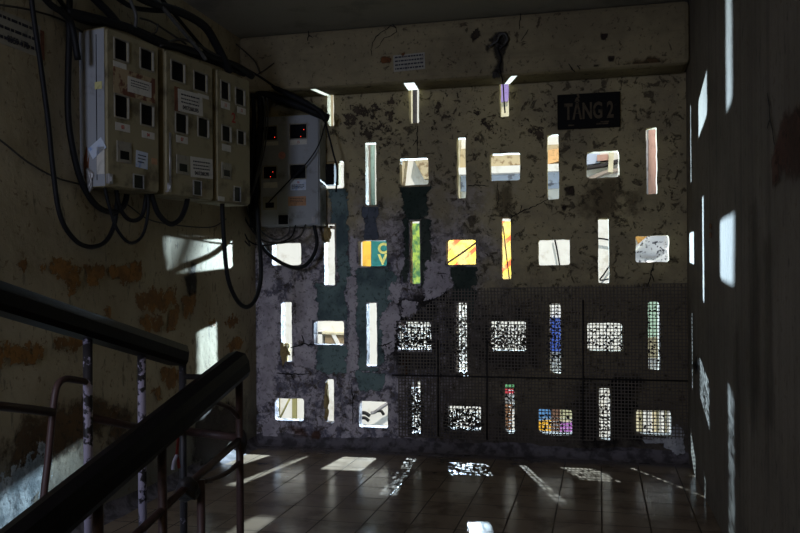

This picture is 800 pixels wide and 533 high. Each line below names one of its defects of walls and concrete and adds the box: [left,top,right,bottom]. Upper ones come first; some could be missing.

peeling [39,256,142,297]
peeling [135,262,197,333]
peeling [292,189,453,392]
peeling [0,337,83,369]
spalling [256,267,280,409]